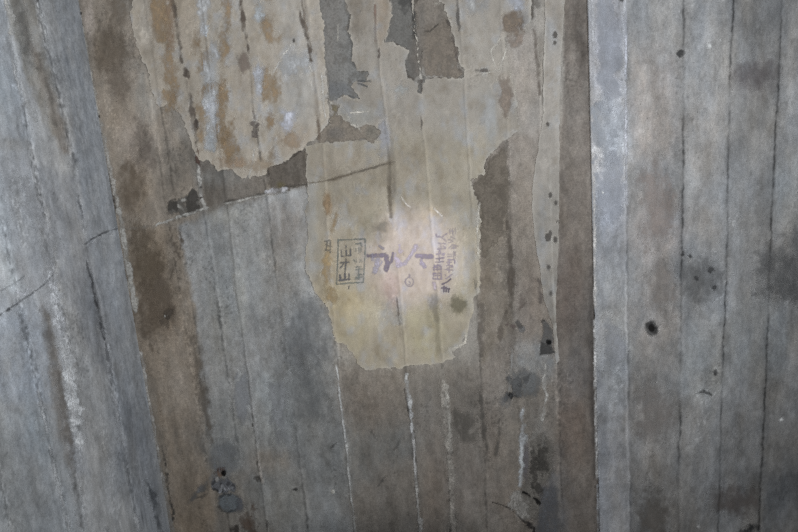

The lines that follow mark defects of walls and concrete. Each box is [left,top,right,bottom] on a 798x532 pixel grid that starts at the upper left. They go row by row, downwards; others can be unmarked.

peeling [317,0,381,144]
peeling [384,0,462,94]
crack [90,166,377,244]
peeling [267,149,308,192]
peeling [473,149,509,257]
crack [0,274,54,315]
crack [87,264,112,375]